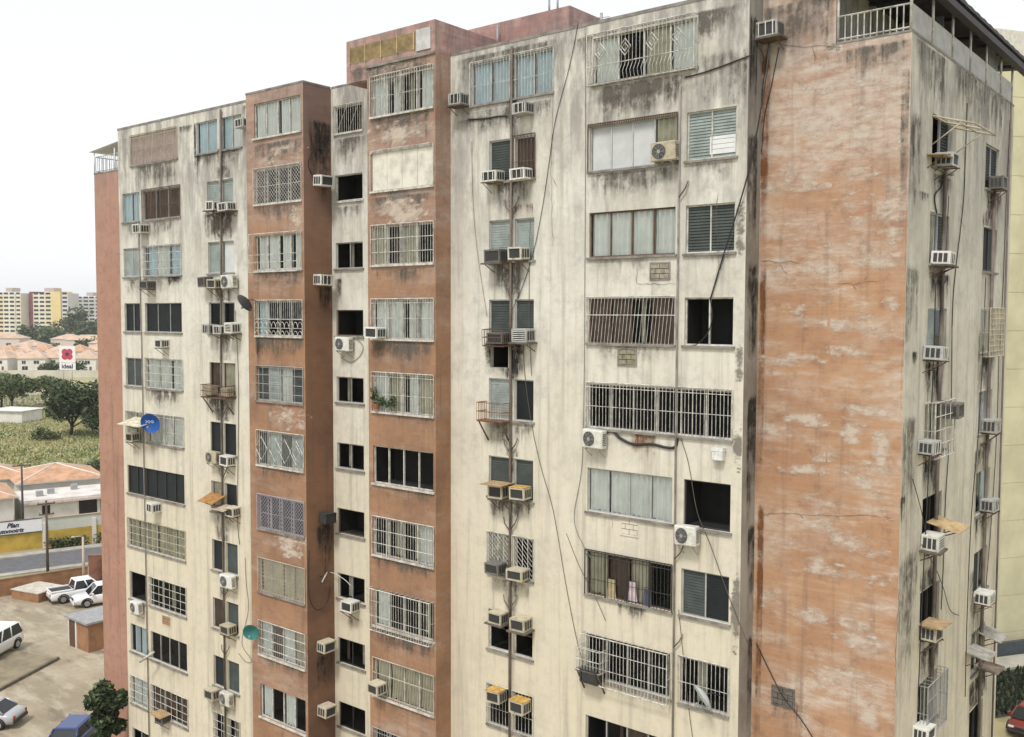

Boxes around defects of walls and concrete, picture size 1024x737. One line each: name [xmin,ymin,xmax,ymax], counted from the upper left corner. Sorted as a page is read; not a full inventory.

leakage [847,41,904,67]
leakage [602,75,685,113]
leakage [310,121,360,174]
leakage [497,182,525,194]
leakage [494,263,522,295]
peeling [785,414,828,427]
peeling [778,453,832,474]
peeling [840,405,894,492]